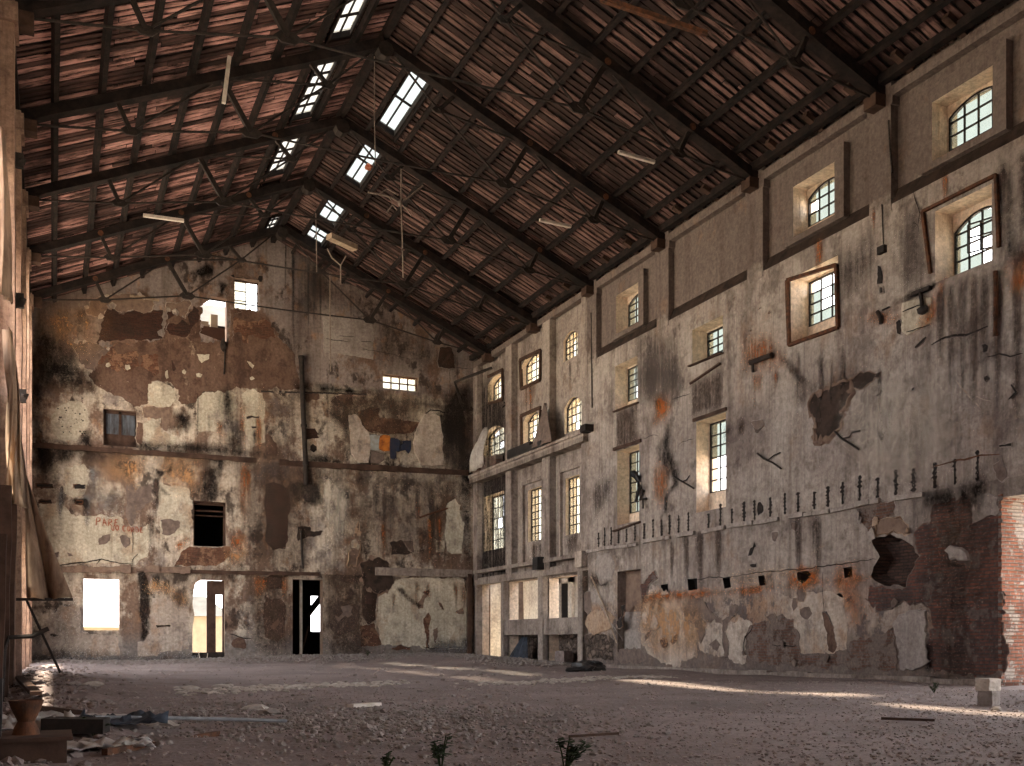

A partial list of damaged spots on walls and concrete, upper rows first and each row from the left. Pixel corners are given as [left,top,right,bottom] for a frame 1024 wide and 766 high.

spalling [72,291,320,445]
spalling [358,408,419,435]
spalling [807,370,883,446]
water stain [659,429,678,510]
spalling [264,482,323,550]
spalling [327,521,414,651]
peeling [640,569,664,612]
peeling [683,594,739,658]
spalling [742,585,899,672]
spalling [851,495,1010,678]